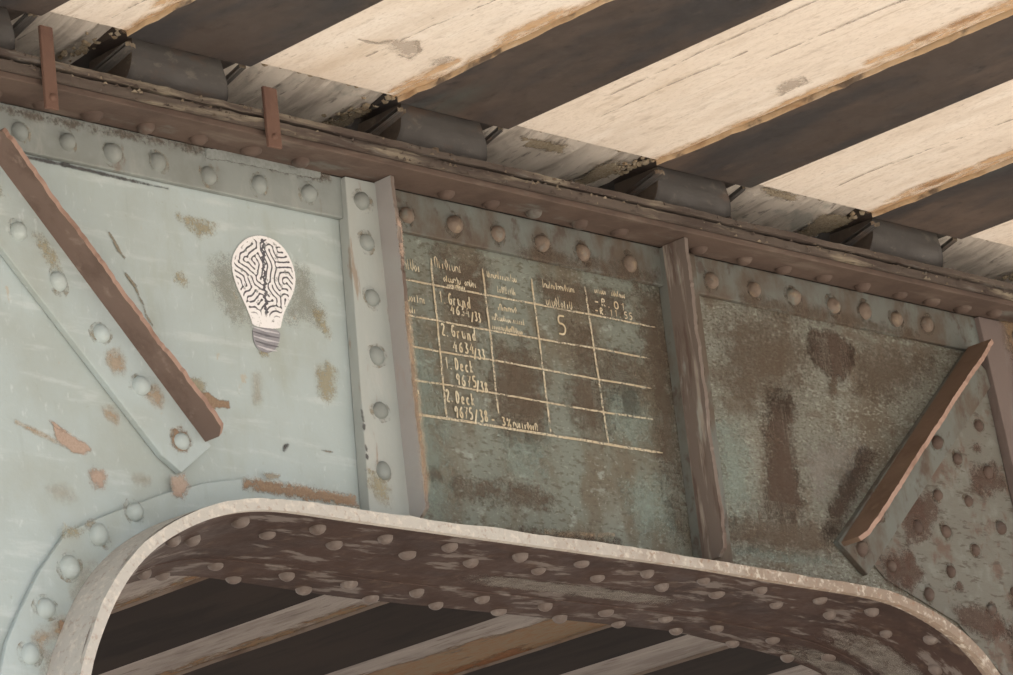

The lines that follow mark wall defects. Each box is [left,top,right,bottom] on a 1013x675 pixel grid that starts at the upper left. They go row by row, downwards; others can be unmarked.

peeling [191,378,230,409]
spalling [26,422,91,455]
corrosion [89,469,106,488]
corrosion [243,473,359,509]
corrosion [880,491,938,592]
corrosion [954,605,1013,659]